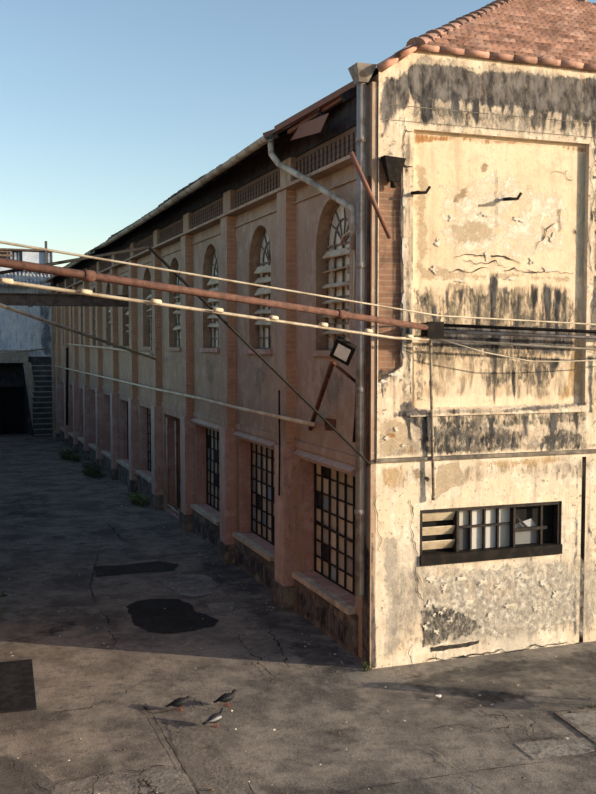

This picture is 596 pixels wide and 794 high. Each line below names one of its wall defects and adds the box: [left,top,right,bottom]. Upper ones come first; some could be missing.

water stain [380,56,596,166]
peeling [435,172,566,264]
crack [447,169,572,274]
crack [574,150,596,271]
water stain [390,140,596,474]